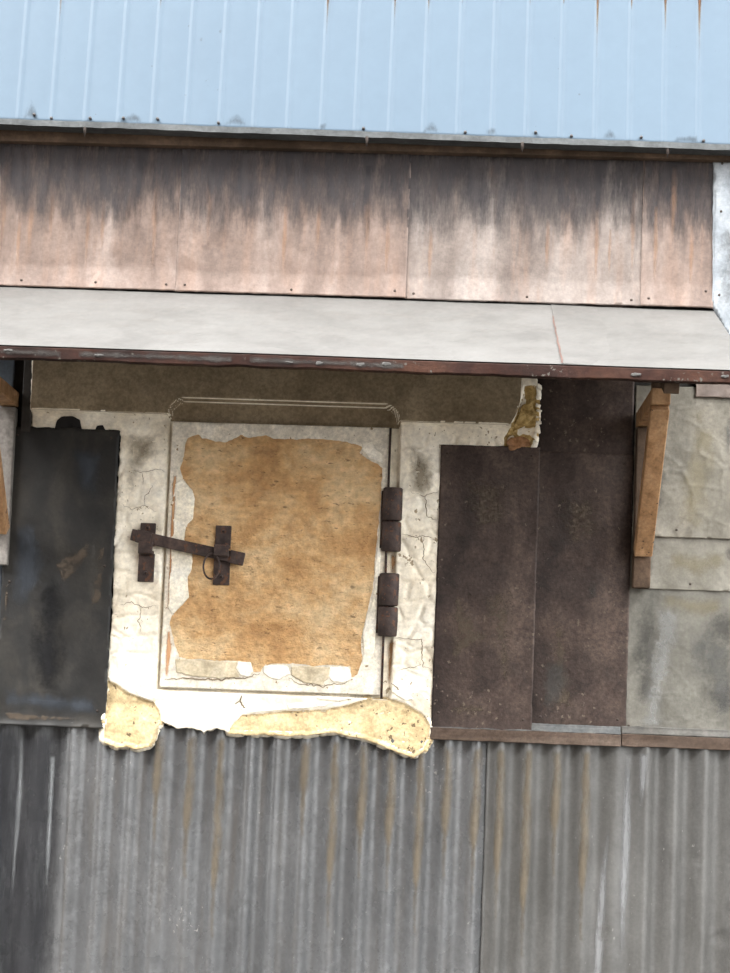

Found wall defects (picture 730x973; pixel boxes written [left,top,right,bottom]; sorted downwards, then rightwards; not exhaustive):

spalling [504,385,540,451]
crack [404,492,437,573]
peeling [168,435,433,759]
crack [391,637,428,690]
spalling [102,681,164,750]